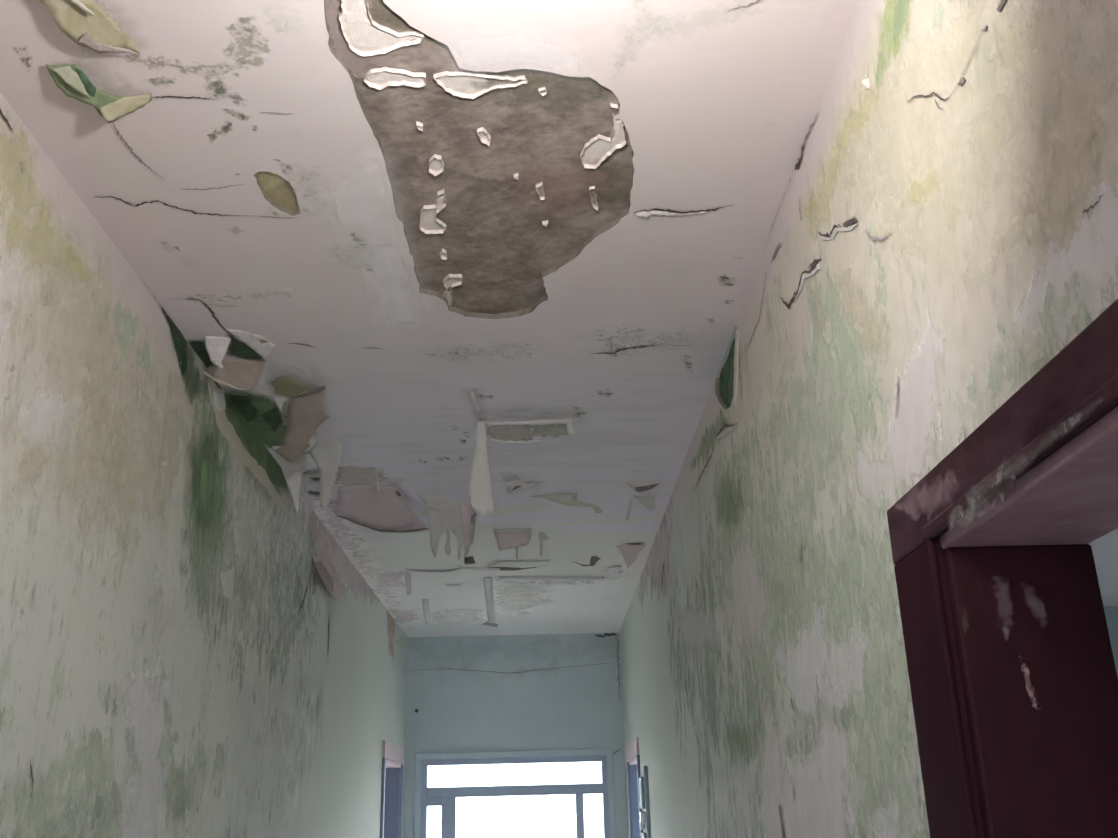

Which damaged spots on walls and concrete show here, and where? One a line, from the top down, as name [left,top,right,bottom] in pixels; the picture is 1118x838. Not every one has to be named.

peeling [45,64,152,123]
crack [94,123,295,219]
mould [127,18,269,138]
flaking render [254,166,300,216]
flaking render [324,0,634,319]
crack [634,205,734,220]
crack [745,112,891,352]
water stain [860,19,996,246]
crack [907,0,1007,109]
water stain [165,314,317,691]
peeling [204,329,646,627]
water stain [668,258,927,838]